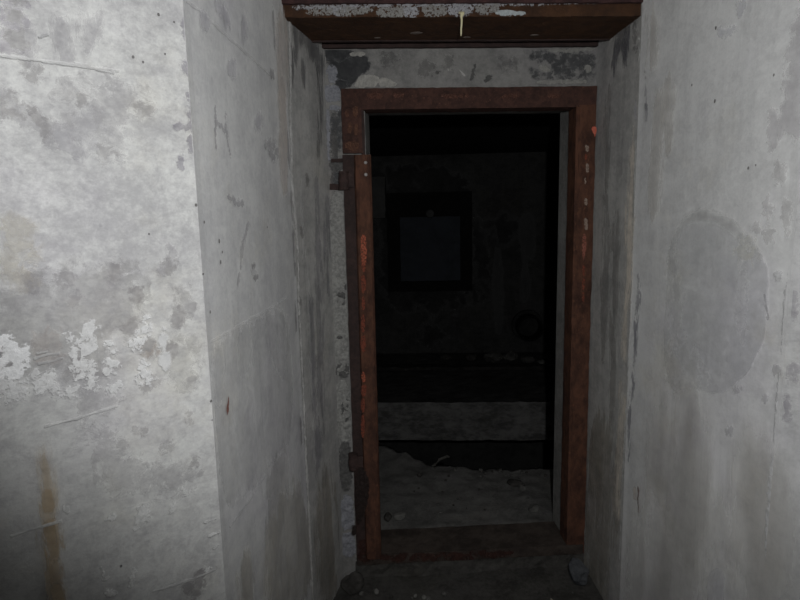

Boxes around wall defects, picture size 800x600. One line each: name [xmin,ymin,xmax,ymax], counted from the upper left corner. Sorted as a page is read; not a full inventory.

peeling [292,3,549,18]
peeling [0,319,123,405]
peeling [128,315,171,386]
leakage [650,196,793,600]
corrosion [40,455,65,600]
corrosion [352,467,514,563]